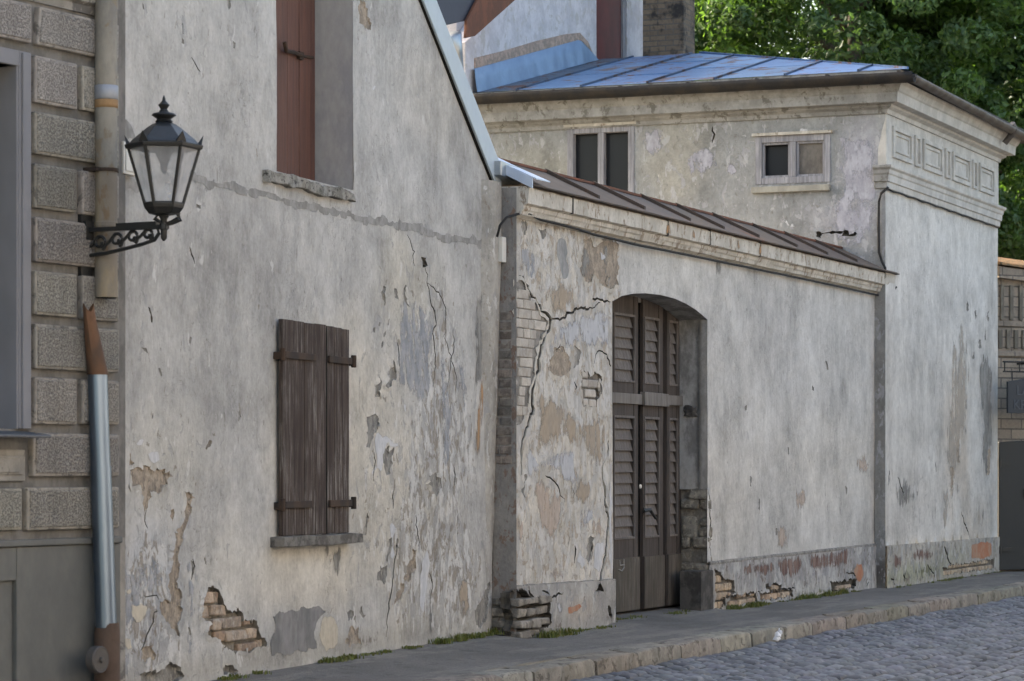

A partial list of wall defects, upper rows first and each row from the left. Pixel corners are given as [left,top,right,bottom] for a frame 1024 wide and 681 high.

crack [409,238,457,394]
flaking render [129,438,173,516]
flaking render [157,486,269,675]
flaking render [365,360,398,448]
flaking render [383,442,394,475]
crack [386,518,420,637]
spalling [473,582,552,637]
crack [519,275,609,499]
flaking render [586,532,595,563]
crack [574,441,609,580]
peeling [744,549,849,582]
leakage [943,326,992,525]